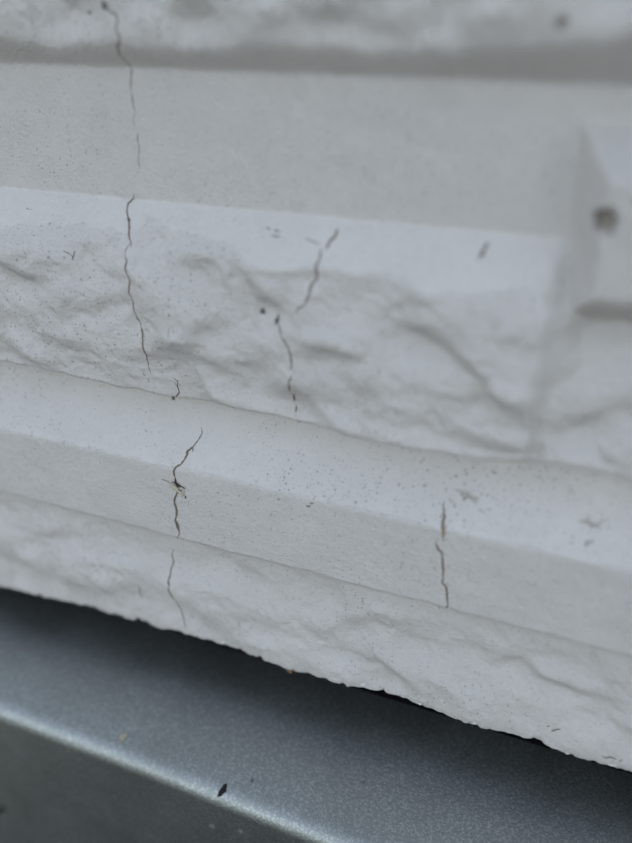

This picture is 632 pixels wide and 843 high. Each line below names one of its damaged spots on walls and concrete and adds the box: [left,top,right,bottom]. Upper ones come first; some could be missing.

crack [102,0,140,169]
crack [125,196,180,397]
crack [277,323,300,423]
crack [296,228,338,313]
crack [162,427,202,636]
crack [435,502,448,609]